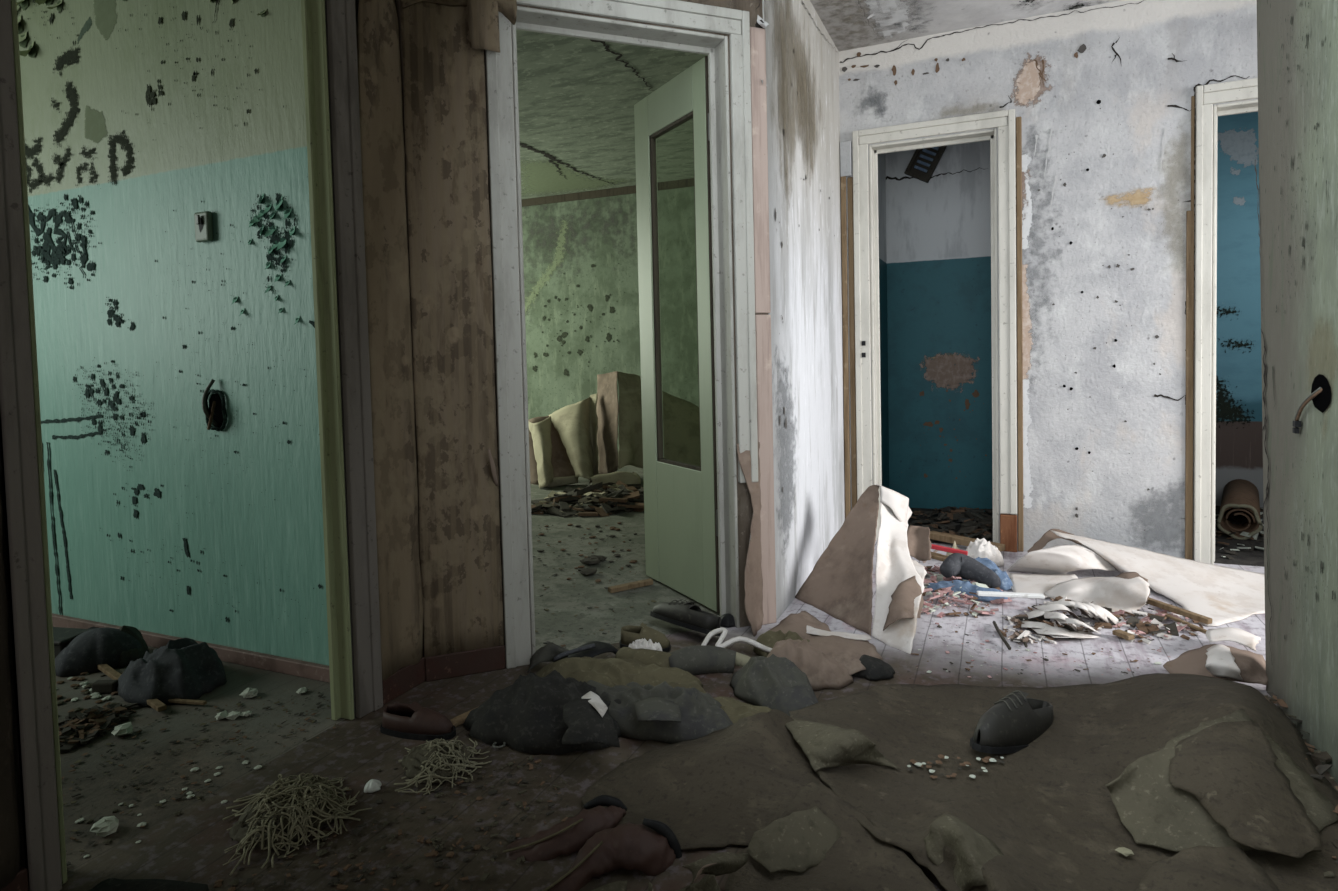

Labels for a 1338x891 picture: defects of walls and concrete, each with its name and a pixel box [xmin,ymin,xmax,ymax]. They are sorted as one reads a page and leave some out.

peeling [85,106,107,143]
peeling [17,0,260,137]